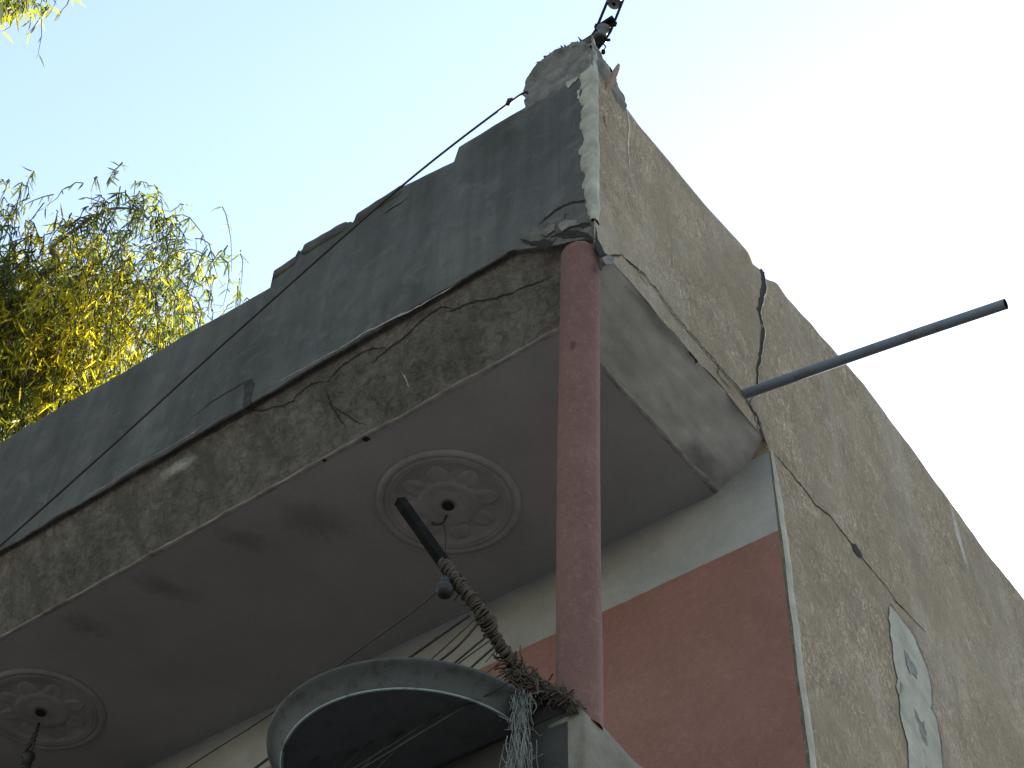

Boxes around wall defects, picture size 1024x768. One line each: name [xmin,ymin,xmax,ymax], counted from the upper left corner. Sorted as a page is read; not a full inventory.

spalling [521,34,627,271]
crack [194,278,549,433]
crack [521,199,768,397]
crack [776,455,926,632]
flaking render [888,603,944,768]